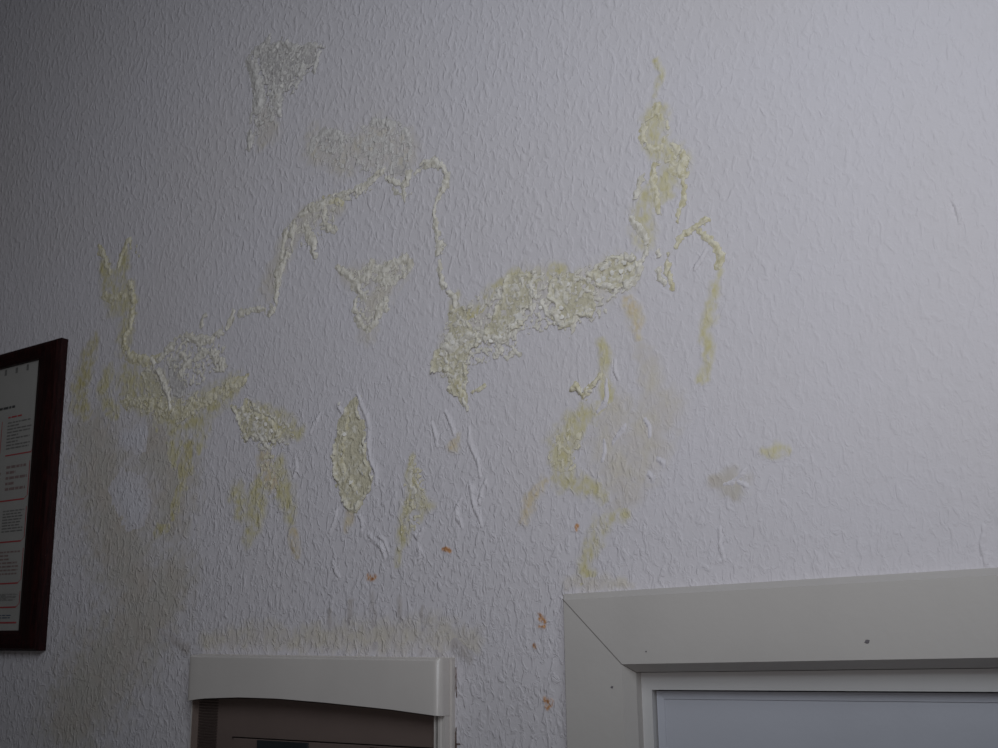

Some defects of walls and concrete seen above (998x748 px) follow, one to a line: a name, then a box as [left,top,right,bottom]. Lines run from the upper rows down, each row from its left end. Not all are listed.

spalling [385,54,726,412]
spalling [230,395,309,452]
spalling [330,391,380,537]
leakage [517,264,726,595]